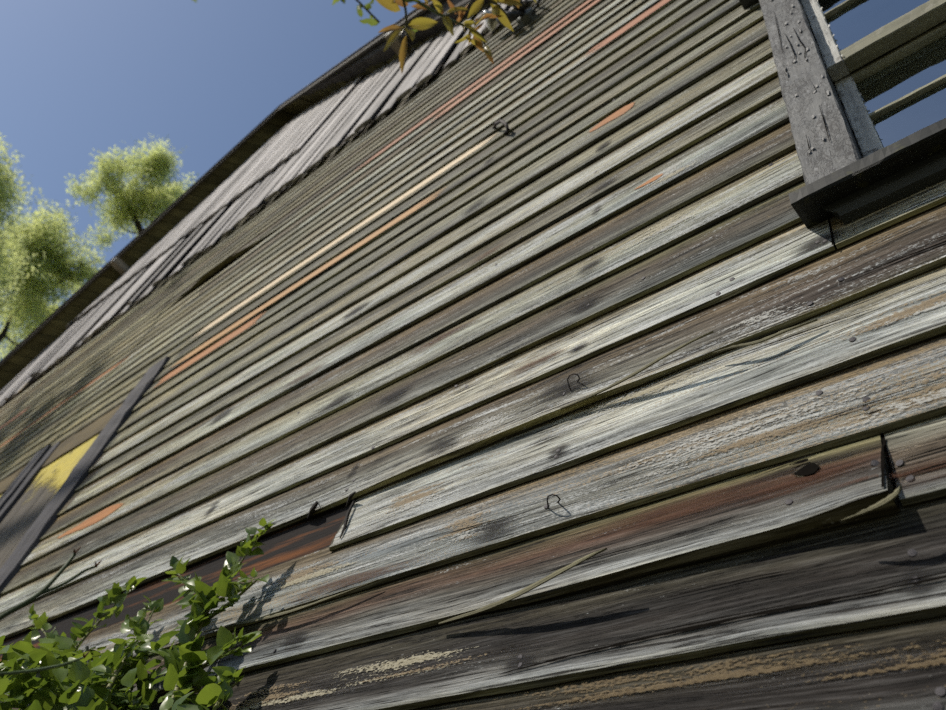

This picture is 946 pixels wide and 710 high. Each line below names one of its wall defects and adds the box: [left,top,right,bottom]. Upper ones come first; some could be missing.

crack [786,379,946,431]
crack [881,437,946,488]